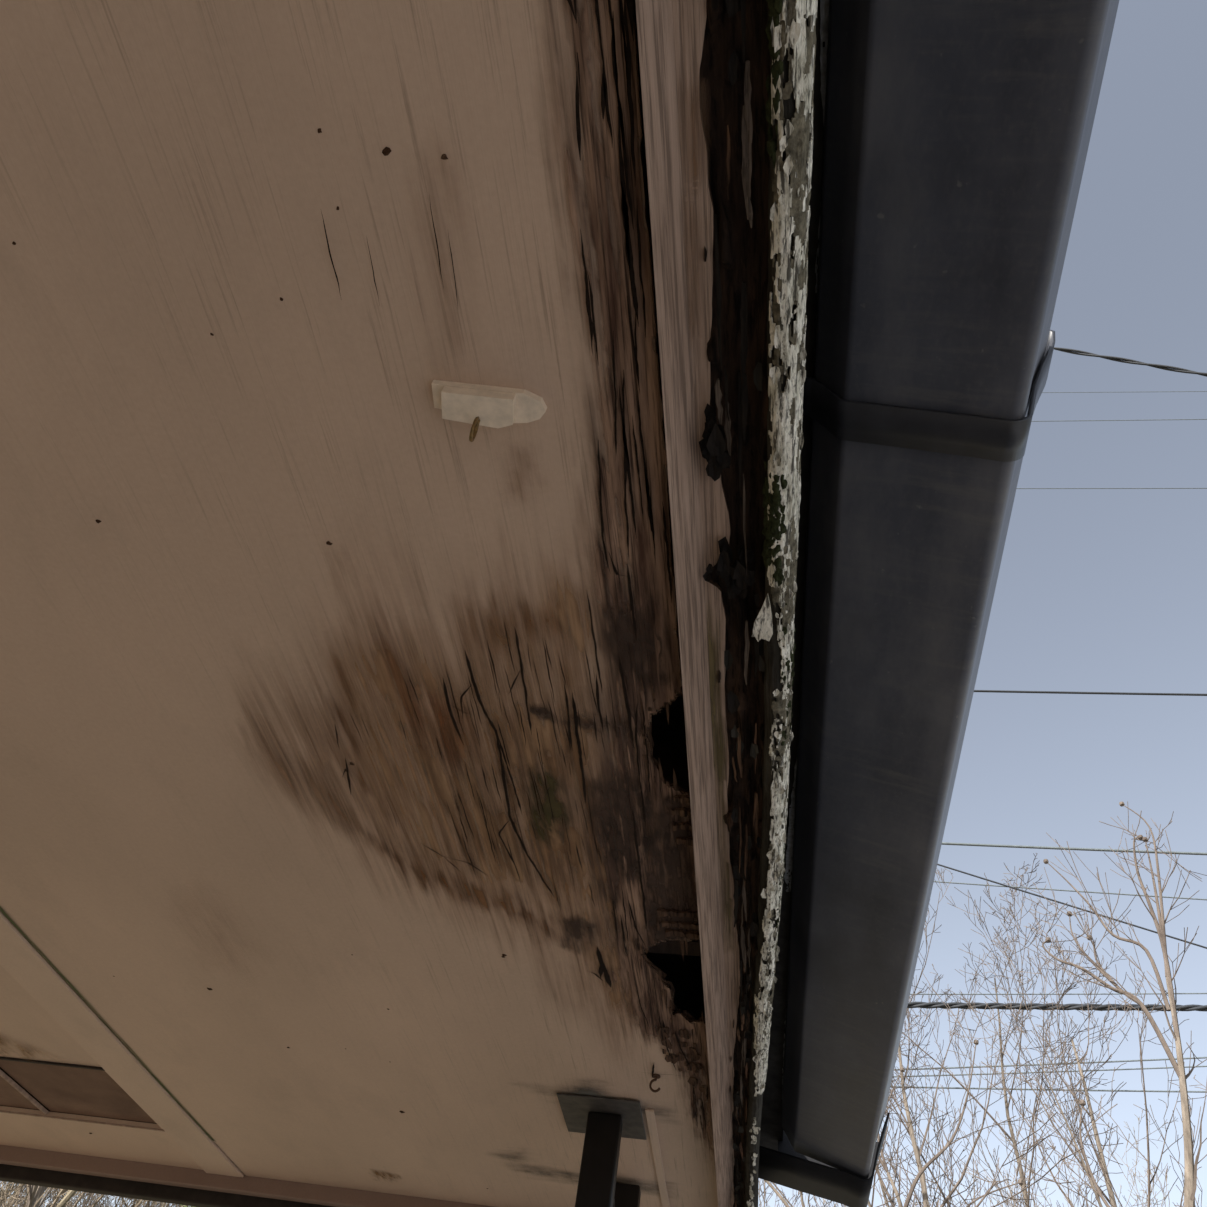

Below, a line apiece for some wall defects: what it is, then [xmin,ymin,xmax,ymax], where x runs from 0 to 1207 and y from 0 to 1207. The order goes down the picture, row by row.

leakage [263,570,699,1032]
crack [443,627,553,895]
crack [564,0,708,1128]
peeling [733,0,830,1107]
peeling [658,1029,703,1087]
peeling [733,1117,760,1207]